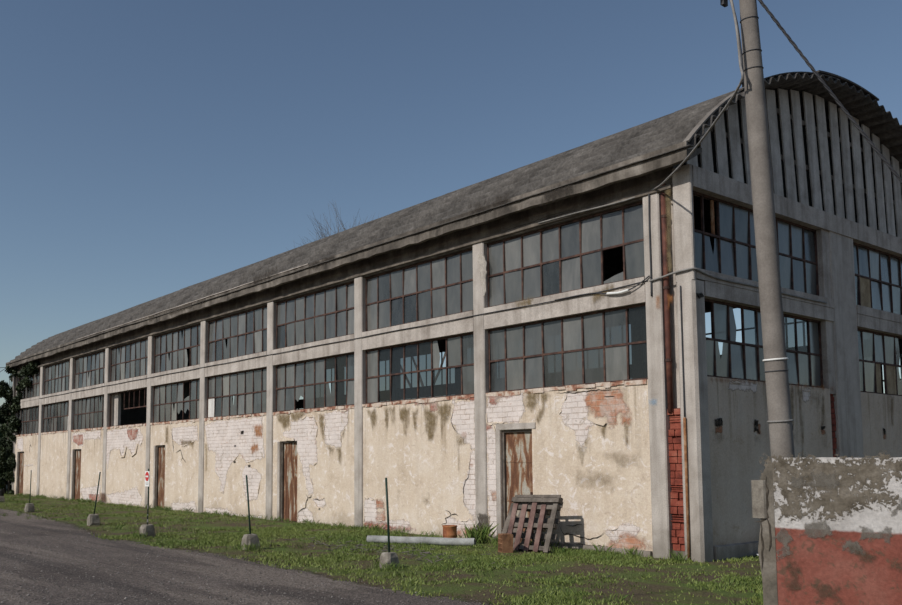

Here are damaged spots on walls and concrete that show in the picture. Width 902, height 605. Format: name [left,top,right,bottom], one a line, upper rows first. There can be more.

flaking render [72,428,143,469]
flaking render [172,416,265,501]
flaking render [283,408,348,522]
water stain [368,405,450,439]
flaking render [445,393,525,539]
flaking render [559,388,630,446]
flaking render [171,501,244,517]
flaking render [363,496,411,531]
crack [560,524,607,547]
peeling [759,453,902,560]